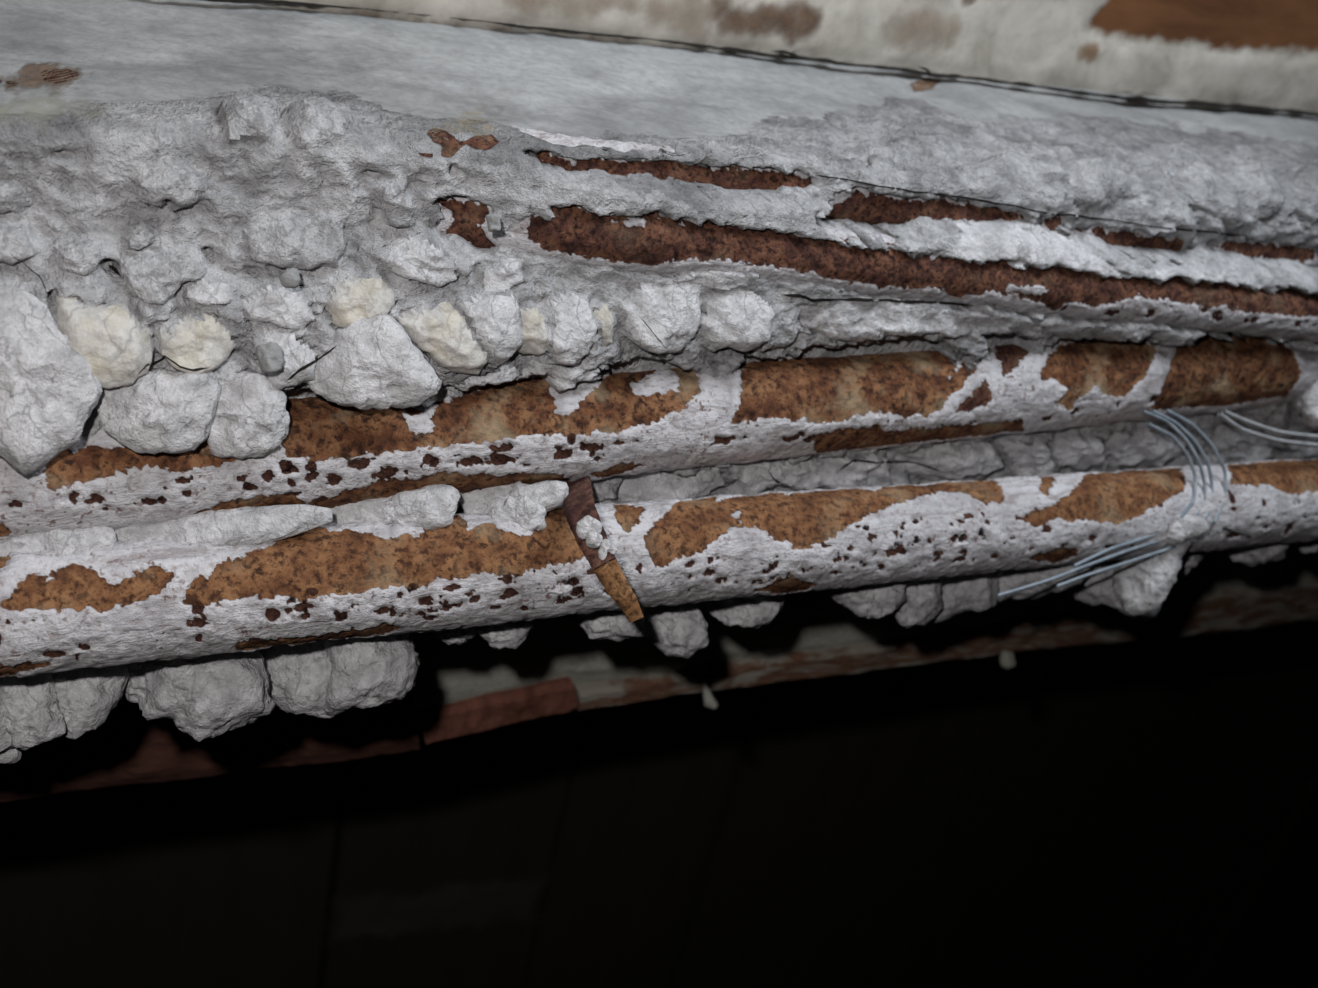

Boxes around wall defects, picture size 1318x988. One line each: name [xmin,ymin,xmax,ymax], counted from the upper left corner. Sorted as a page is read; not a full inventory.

corrosion [535,150,812,190]
corrosion [438,198,496,249]
corrosion [527,189,1318,421]
corrosion [40,368,701,514]
spalling [0,85,1318,678]
corrosion [711,350,1025,453]
corrosion [0,563,174,644]
corrosion [182,507,609,651]
corrosion [612,480,1016,594]
corrosion [1015,468,1187,563]
corrosion [1227,459,1318,535]
corrosion [0,643,90,676]